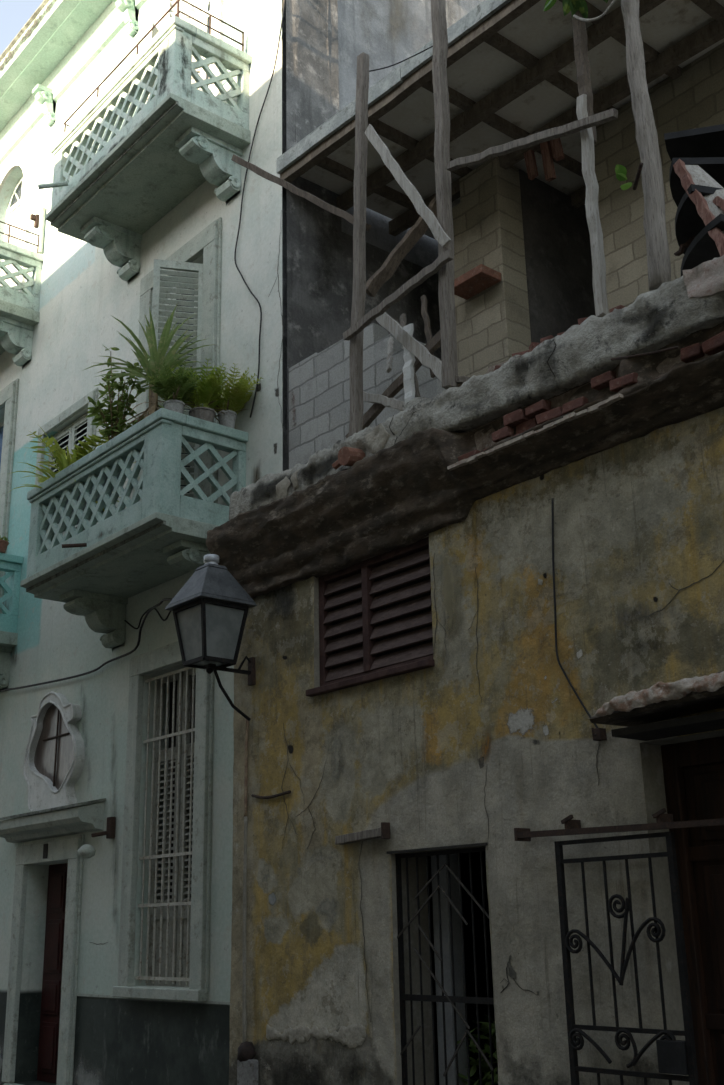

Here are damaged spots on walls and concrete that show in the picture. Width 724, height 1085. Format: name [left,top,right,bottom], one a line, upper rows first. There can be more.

flaking render [447,331,724,471]